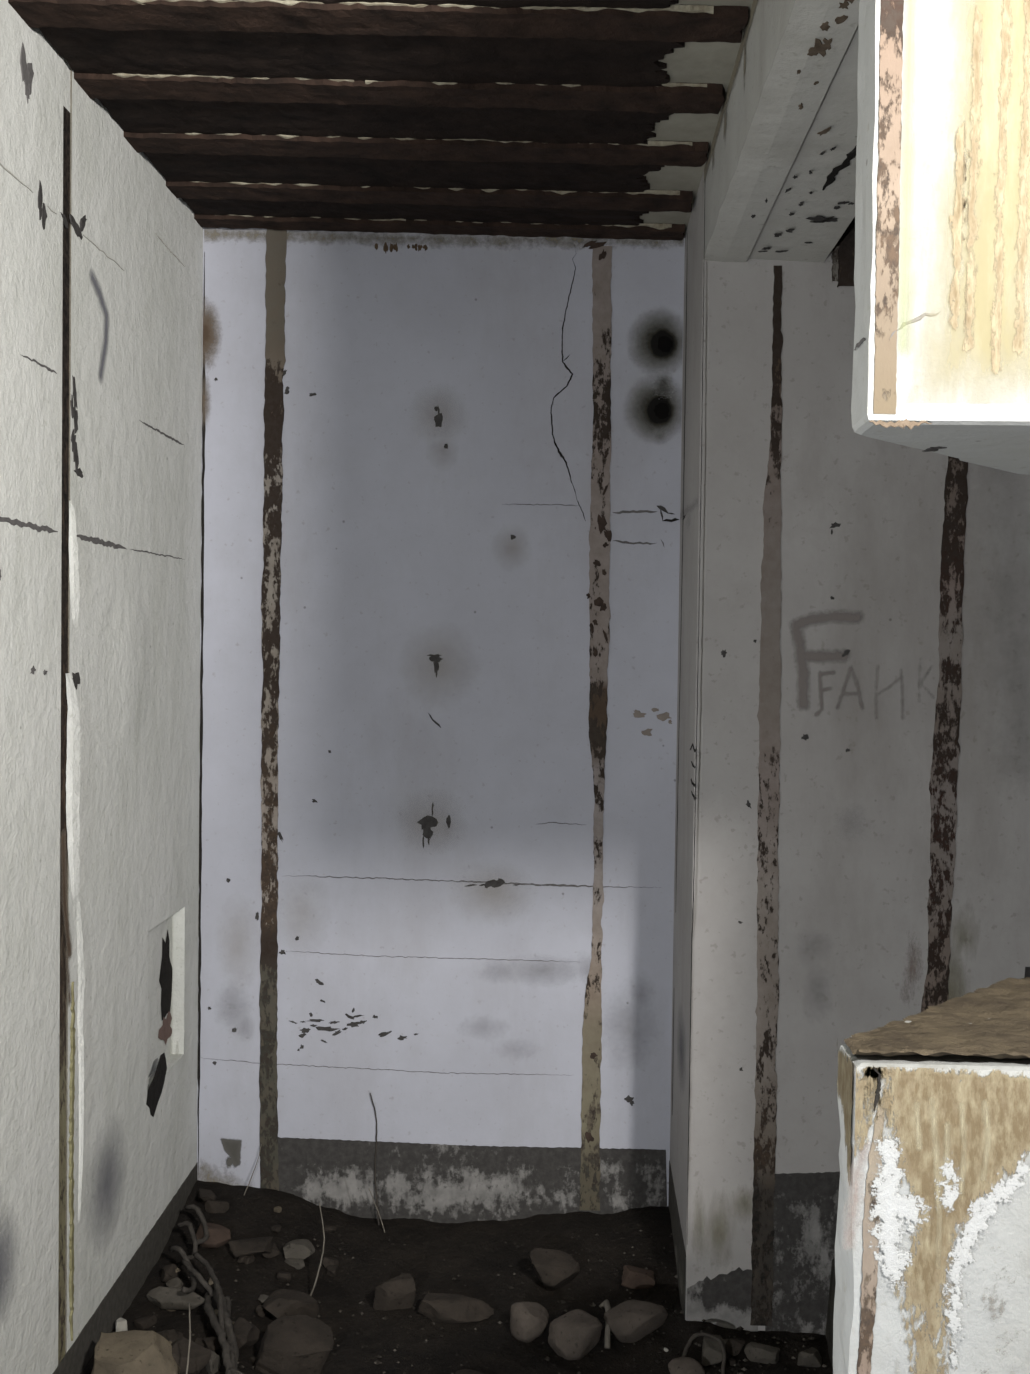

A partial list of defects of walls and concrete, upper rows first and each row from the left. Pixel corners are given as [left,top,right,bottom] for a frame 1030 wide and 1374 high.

peeling [797,0,854,85]
peeling [758,170,854,253]
crack [810,145,857,223]
rust [593,514,612,575]
rust [586,593,608,657]
crack [288,244,704,1234]